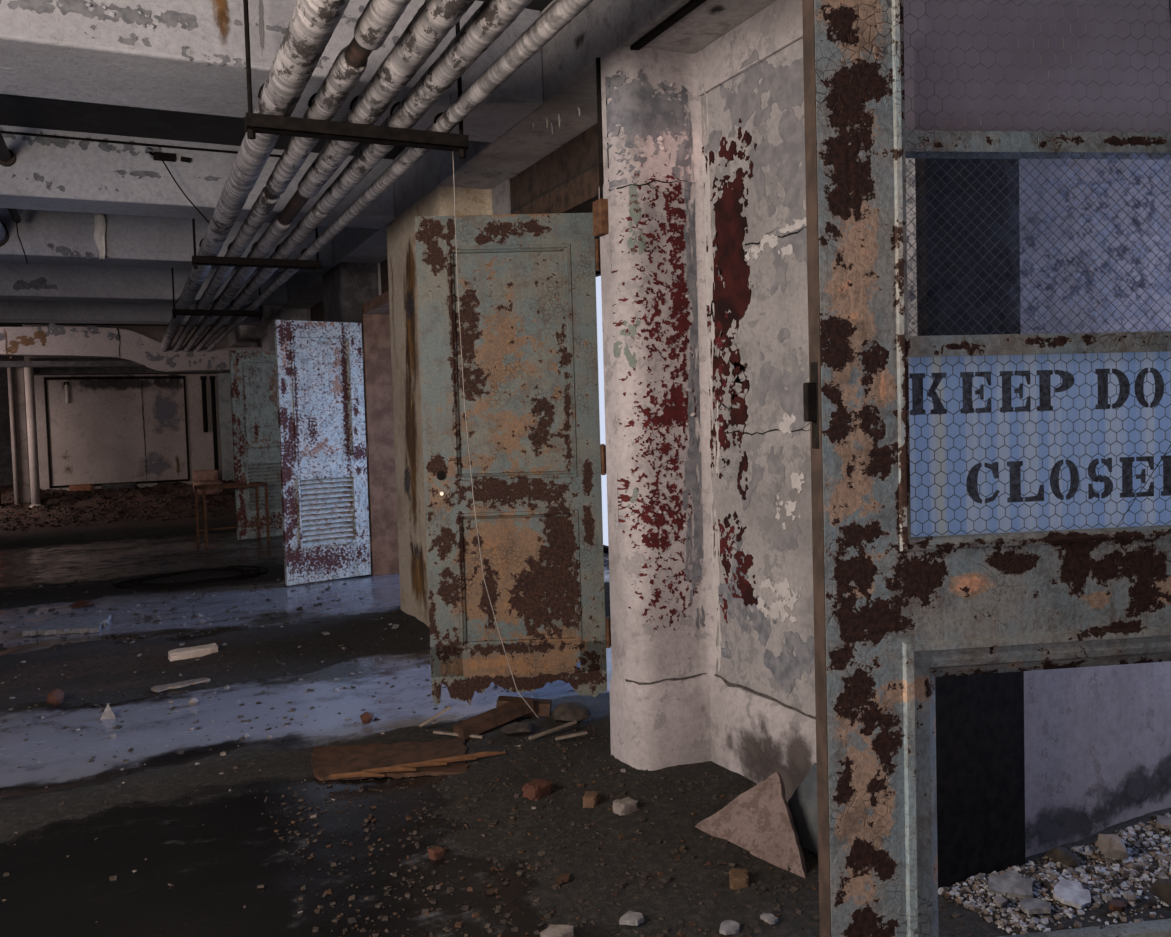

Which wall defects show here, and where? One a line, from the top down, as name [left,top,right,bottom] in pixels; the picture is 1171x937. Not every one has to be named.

peeling [0,0,198,47]
corrosion [213,0,228,39]
peeling [181,46,246,69]
peeling [605,50,815,694]
damp [1025,755,1171,846]